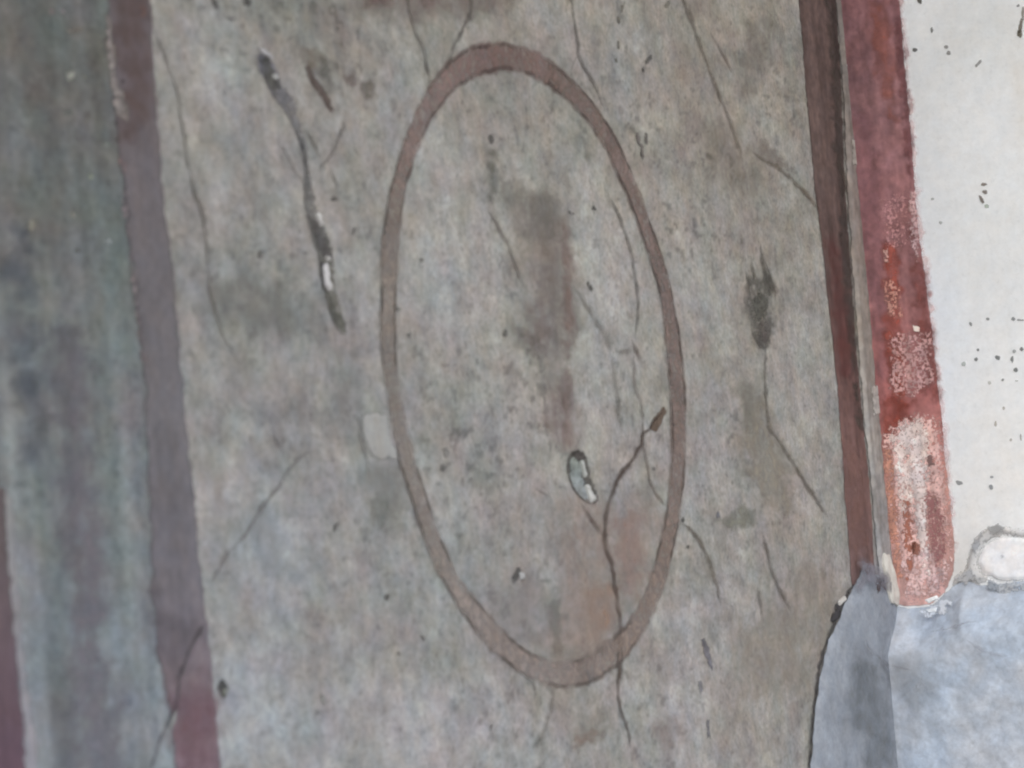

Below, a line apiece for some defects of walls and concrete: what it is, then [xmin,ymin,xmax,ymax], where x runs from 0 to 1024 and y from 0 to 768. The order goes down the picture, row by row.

crack [217,481,283,572]
flaking render [567,450,599,504]
crack [588,415,659,632]
crack [765,360,822,509]
crack [151,628,202,768]
crack [618,660,631,742]